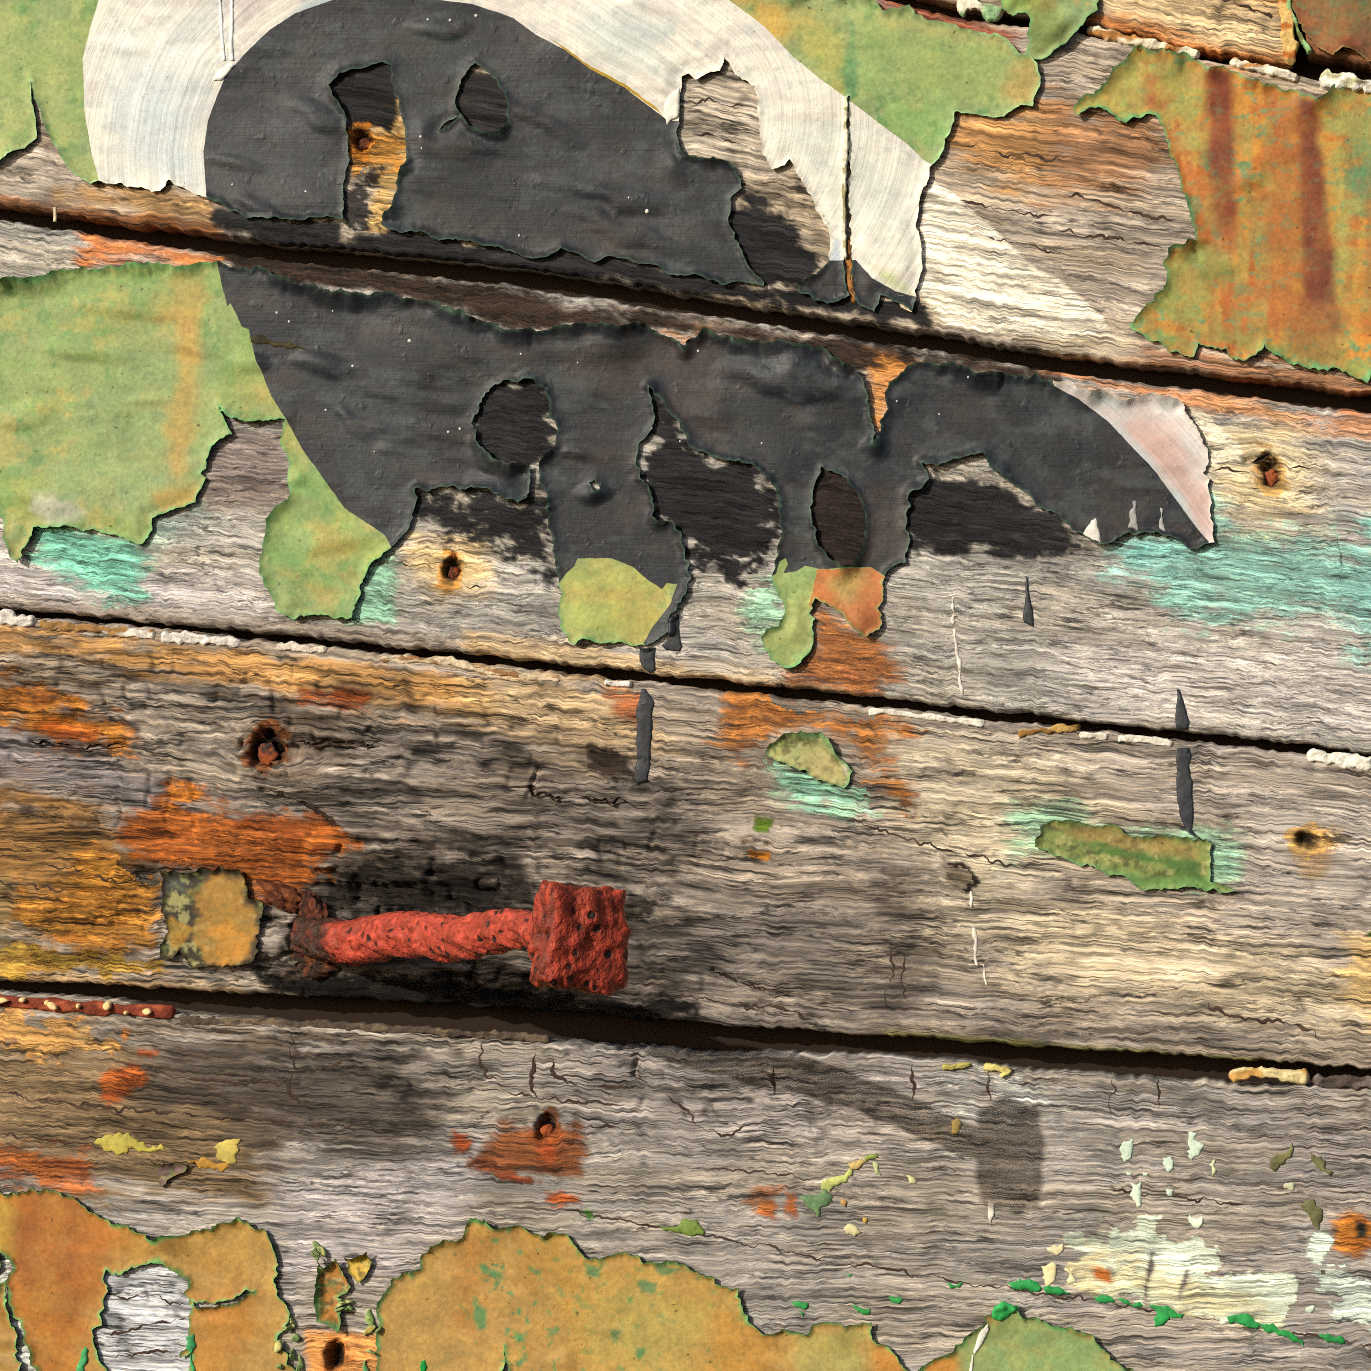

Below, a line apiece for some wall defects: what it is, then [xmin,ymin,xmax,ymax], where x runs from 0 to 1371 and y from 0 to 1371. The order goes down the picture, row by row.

peeling [1291,0,1371,62]
peeling [0,0,1099,312]
peeling [1073,45,1371,384]
peeling [0,261,1214,668]
peeling [951,597,964,695]
peeling [0,1188,296,1371]
peeling [311,1252,372,1334]
rust [452,1120,587,1206]
peeling [375,1217,1134,1371]
rust [1334,1213,1371,1256]